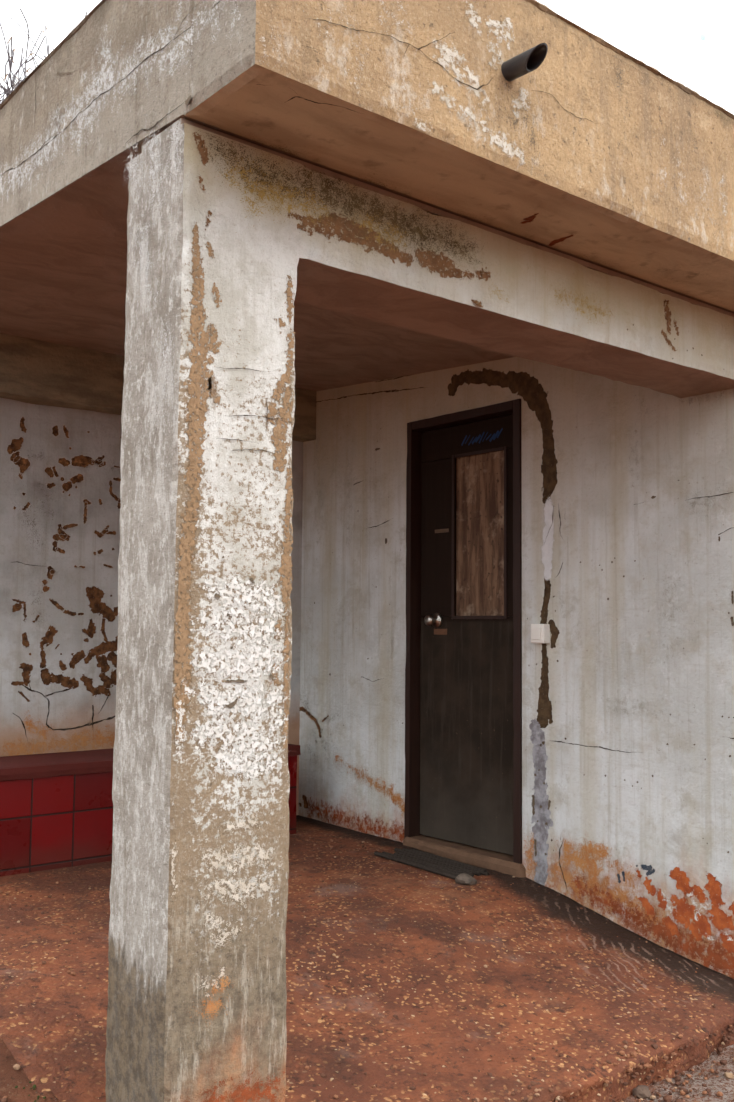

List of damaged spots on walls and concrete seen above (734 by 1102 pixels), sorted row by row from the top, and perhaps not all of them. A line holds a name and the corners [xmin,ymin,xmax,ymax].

crack [3,0,221,174]
crack [307,18,495,90]
leakage [0,0,514,437]
peeling [288,212,492,290]
peeling [44,424,121,569]
peeling [174,222,329,794]
peeling [448,368,558,504]
peeling [11,565,118,702]
crack [13,684,115,741]
peeling [190,812,276,947]
leakage [522,832,734,978]
peeling [634,866,734,954]